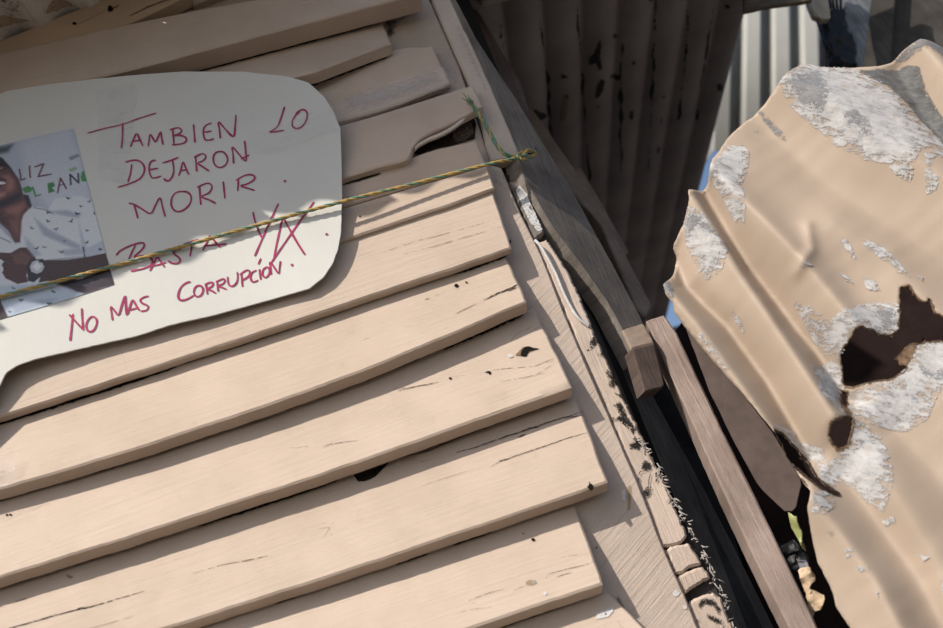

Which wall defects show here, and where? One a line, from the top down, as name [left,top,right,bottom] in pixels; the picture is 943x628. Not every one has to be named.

peeling [778,39,943,194]
peeling [710,144,749,223]
peeling [683,205,728,279]
peeling [863,239,907,274]
crack [456,412,584,465]
peeling [774,303,943,526]
crack [10,591,143,628]